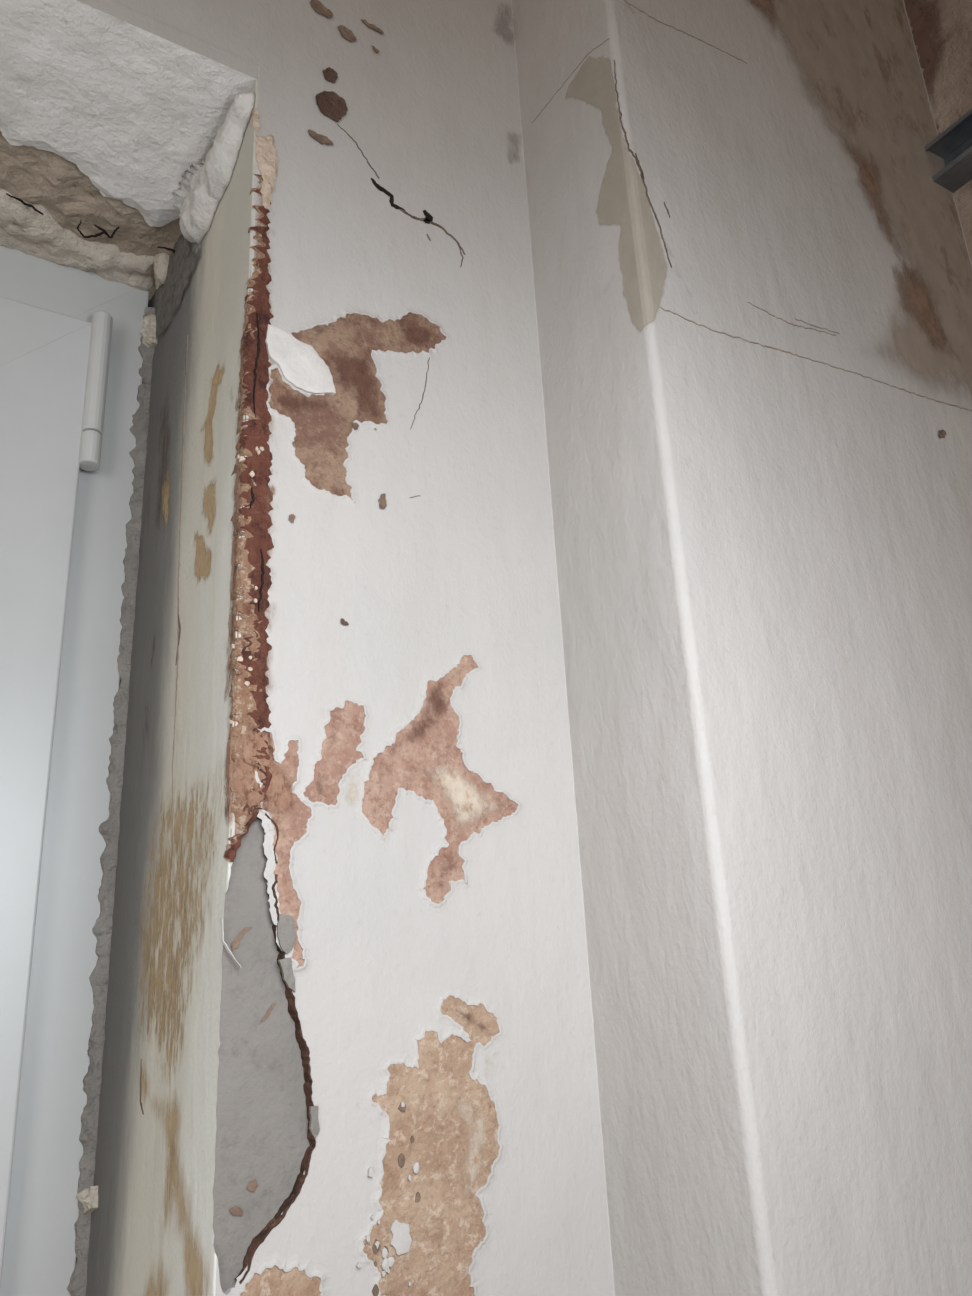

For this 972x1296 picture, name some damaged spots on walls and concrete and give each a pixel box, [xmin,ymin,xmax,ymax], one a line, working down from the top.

flaking render [0,91,255,338]
crack [337,124,465,267]
peeling [566,58,666,331]
leakage [770,0,972,391]
corrosion [223,107,292,862]
peeling [265,306,452,508]
crack [411,357,430,428]
peeling [213,648,525,1296]